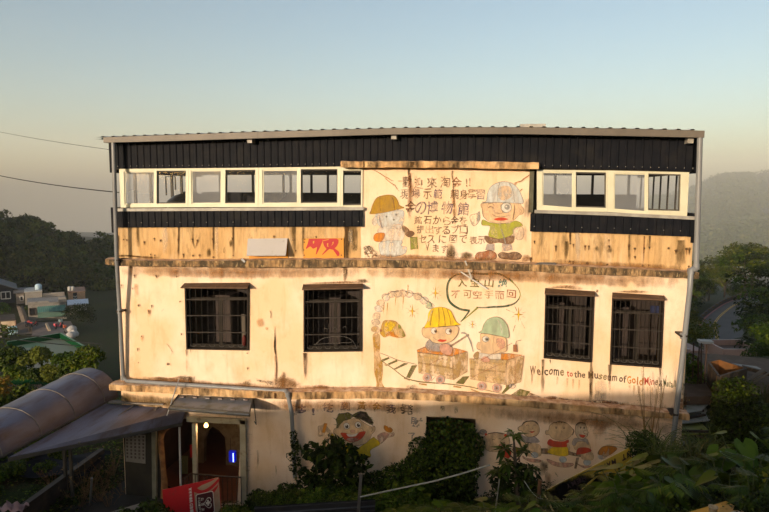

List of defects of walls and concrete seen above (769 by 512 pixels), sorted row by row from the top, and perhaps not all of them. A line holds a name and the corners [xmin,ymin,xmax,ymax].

crack [269,312,277,399]
water stain [268,374,296,389]